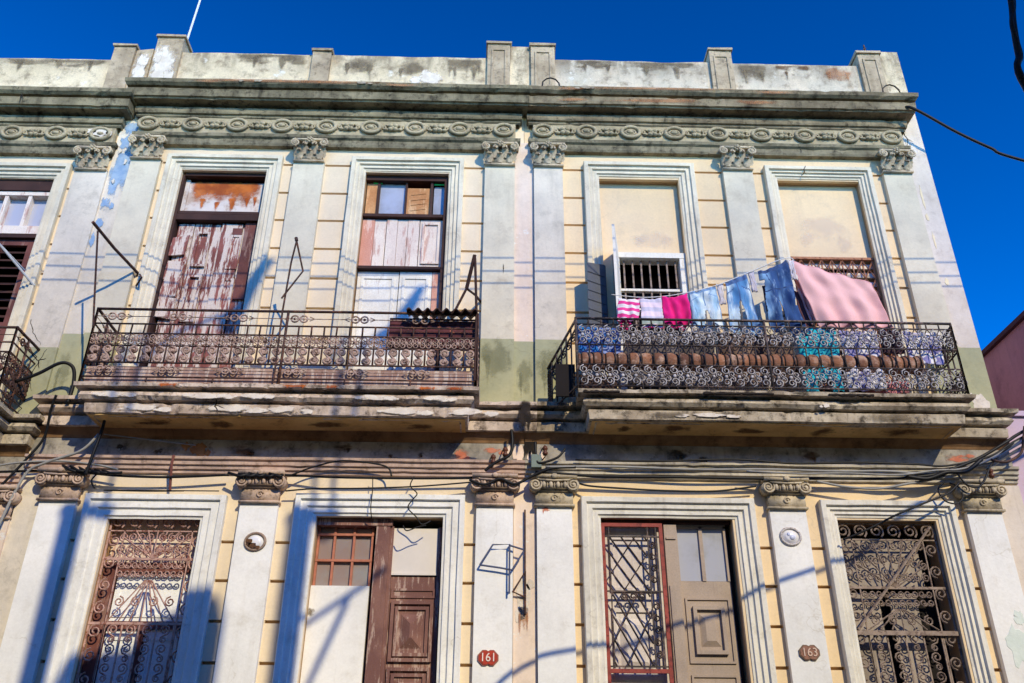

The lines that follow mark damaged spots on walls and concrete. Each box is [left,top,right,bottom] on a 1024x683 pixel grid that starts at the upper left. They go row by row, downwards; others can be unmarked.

flaking render [132,45,175,78]
water stain [345,59,372,74]
water stain [399,63,422,76]
water stain [448,59,481,77]
water stain [739,65,808,83]
water stain [826,68,849,80]
peeling [87,123,139,247]
spalling [92,391,171,412]
spalling [182,393,313,414]